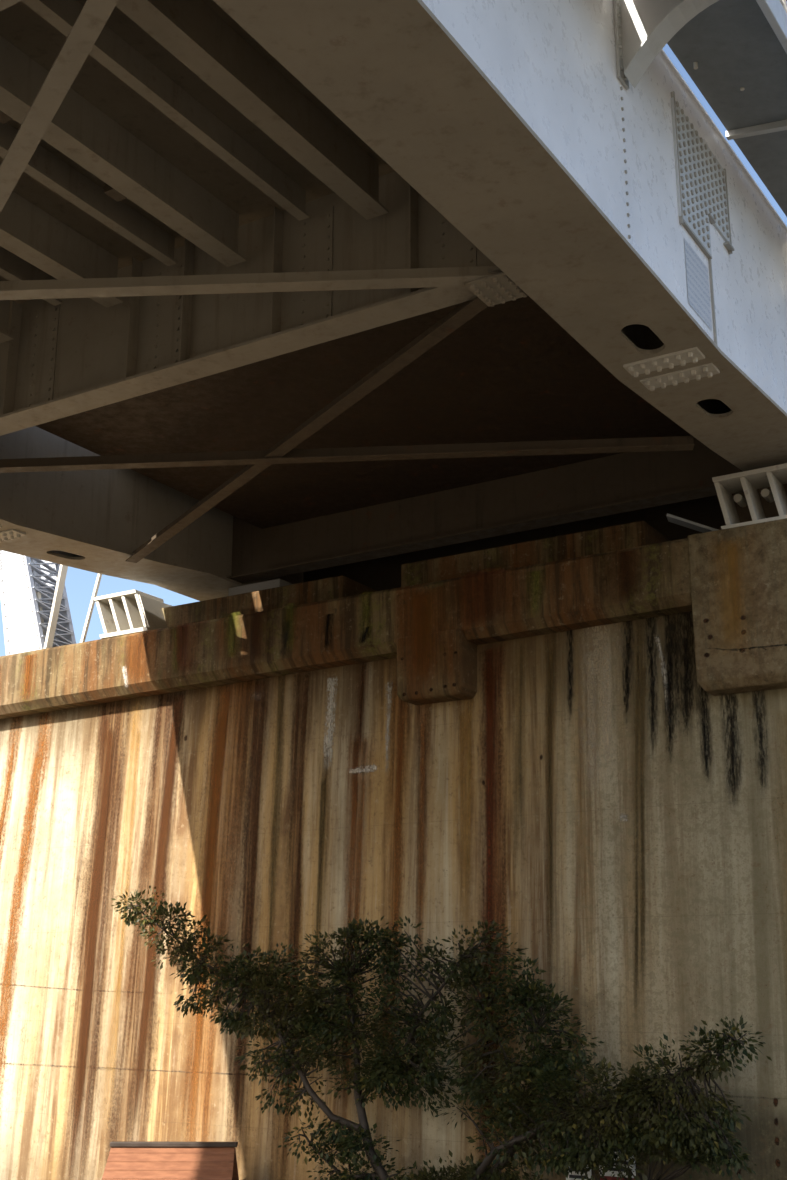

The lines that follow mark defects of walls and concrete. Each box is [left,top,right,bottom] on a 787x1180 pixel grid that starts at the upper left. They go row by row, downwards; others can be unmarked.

corrosion [0,712,51,1090]
corrosion [67,702,129,1157]
corrosion [109,691,187,1141]
corrosion [186,675,309,1144]
corrosion [316,743,329,944]
corrosion [346,663,367,963]
corrosion [389,683,456,962]
corrosion [477,647,506,1158]
leakage [623,621,633,712]
corrosion [635,627,645,954]
leakage [646,611,741,792]
leakage [754,691,767,783]